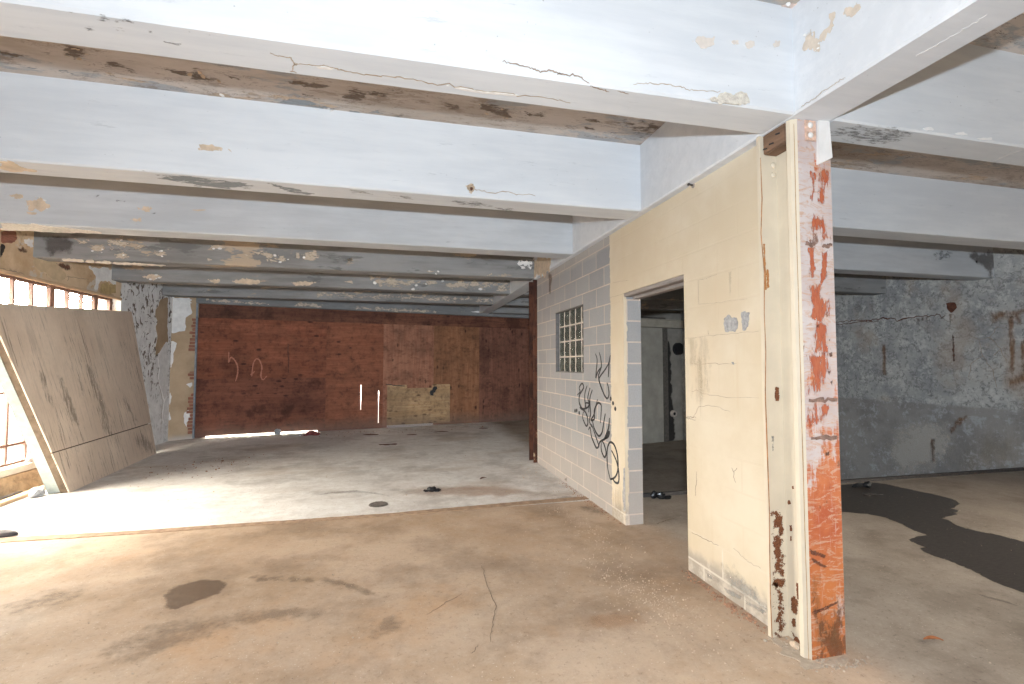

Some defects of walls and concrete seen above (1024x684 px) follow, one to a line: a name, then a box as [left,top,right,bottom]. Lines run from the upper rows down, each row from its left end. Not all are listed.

peeling [802,3,861,52]
crack [270,53,720,103]
spalling [708,91,750,105]
peeling [245,250,319,263]
crack [836,314,944,325]
corrosion [993,310,1024,385]
water stain [841,483,1024,592]
corrosion [770,486,800,644]
crack [472,566,497,653]